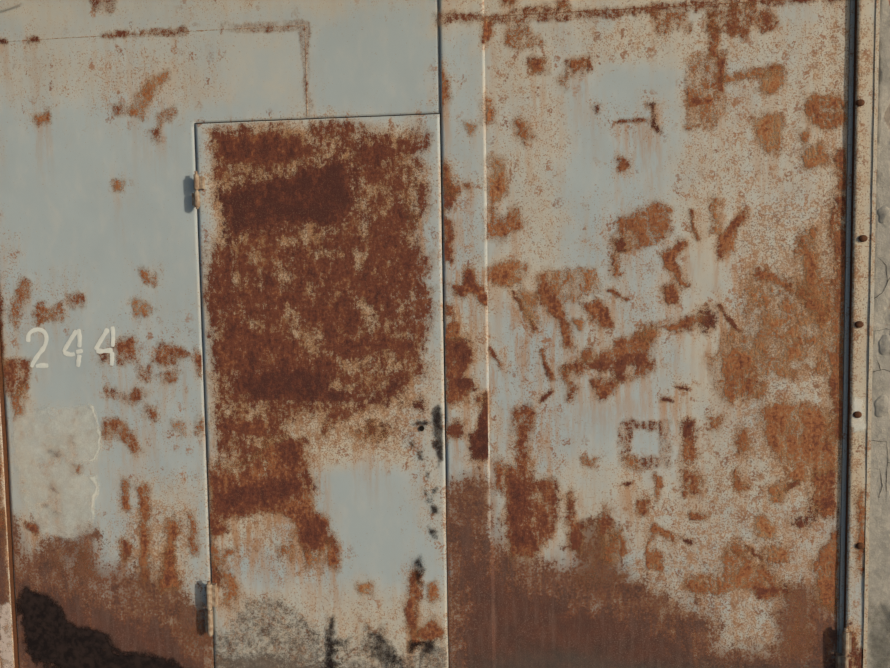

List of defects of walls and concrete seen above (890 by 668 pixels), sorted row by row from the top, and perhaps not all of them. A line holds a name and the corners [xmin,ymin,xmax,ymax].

corrosion [113,71,170,121]
corrosion [102,26,188,38]
corrosion [151,108,177,140]
corrosion [241,22,311,104]
corrosion [435,0,815,131]
corrosion [0,119,433,668]
corrosion [403,92,863,668]
corrosion [856,489,866,572]